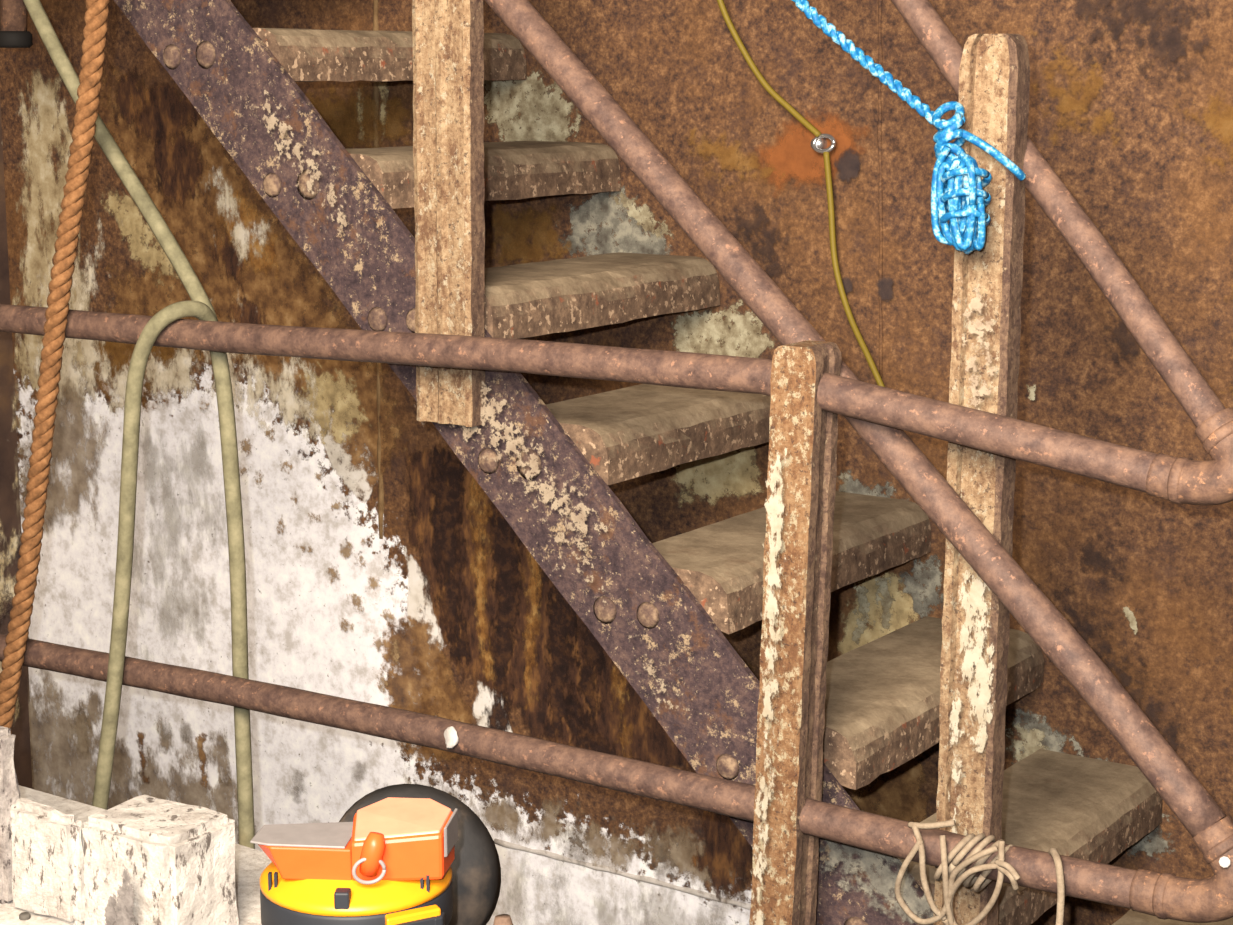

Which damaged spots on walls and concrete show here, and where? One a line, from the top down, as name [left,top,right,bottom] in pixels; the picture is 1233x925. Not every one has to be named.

rust [104,65,345,329]
rust [690,116,866,189]
peeling [15,667,106,800]
peeling [28,338,128,653]
peeling [109,685,238,844]
peeling [125,348,233,676]
peeling [227,353,443,707]
rust [229,353,696,773]
rust [471,800,562,843]
peeling [250,448,787,925]
rust [583,810,753,903]
rust [671,446,761,504]